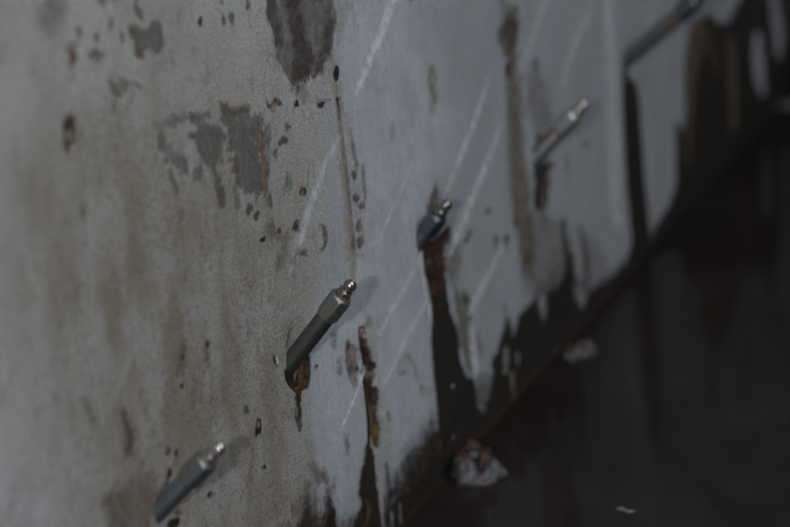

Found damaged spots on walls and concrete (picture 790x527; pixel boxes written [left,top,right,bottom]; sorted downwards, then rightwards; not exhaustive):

leakage [267,0,337,82]
leakage [158,103,270,208]
leakage [297,0,790,527]